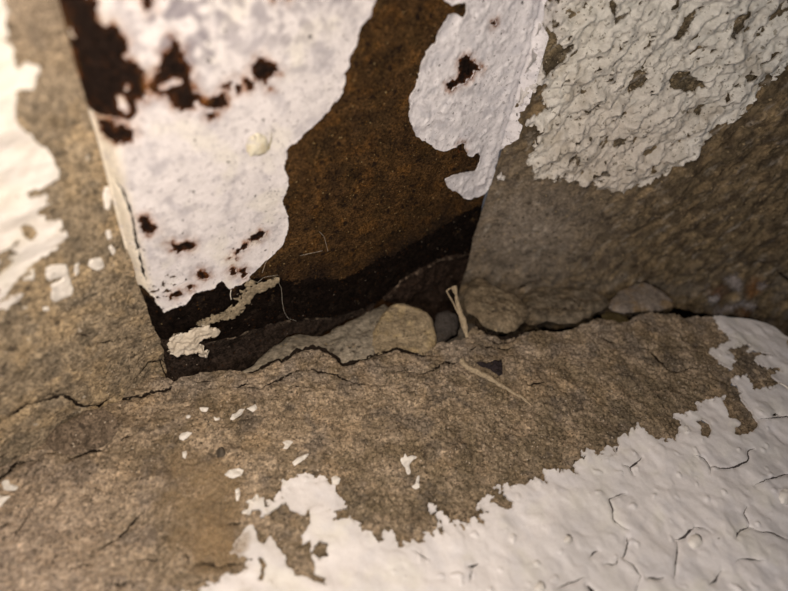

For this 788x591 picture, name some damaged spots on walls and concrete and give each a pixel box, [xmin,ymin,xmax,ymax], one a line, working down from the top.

rust [59,0,282,145]
peeling [542,0,588,76]
peeling [671,0,716,69]
peeling [0,0,167,468]
rust [137,0,485,382]
peeling [458,65,788,337]
crack [8,359,174,418]
crack [229,281,663,389]
crack [627,308,761,373]
crack [0,433,136,481]
peeling [0,311,780,591]
crack [591,493,705,591]